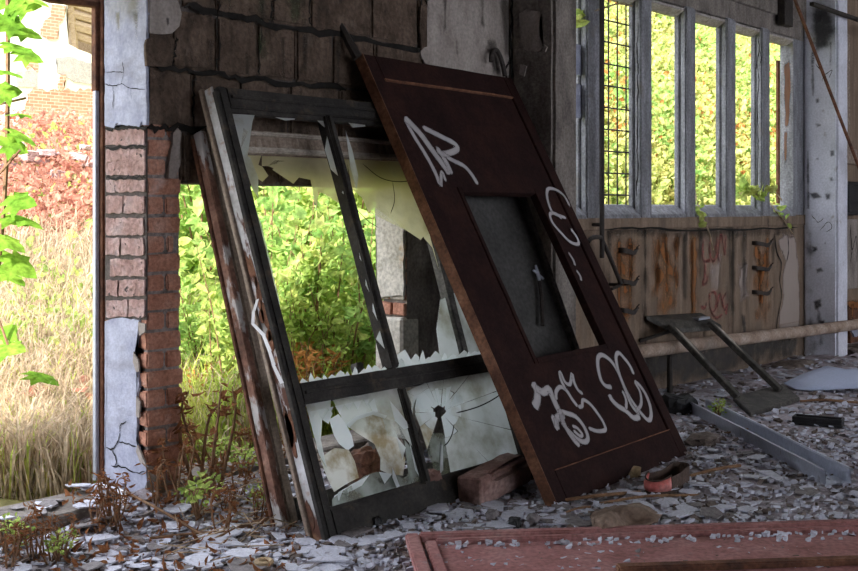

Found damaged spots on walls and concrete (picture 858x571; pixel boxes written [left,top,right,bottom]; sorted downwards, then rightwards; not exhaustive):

crack [104,0,422,151]
crack [106,174,146,182]
spalling [104,0,182,493]
corrosion [655,235,679,313]
crack [106,421,144,474]